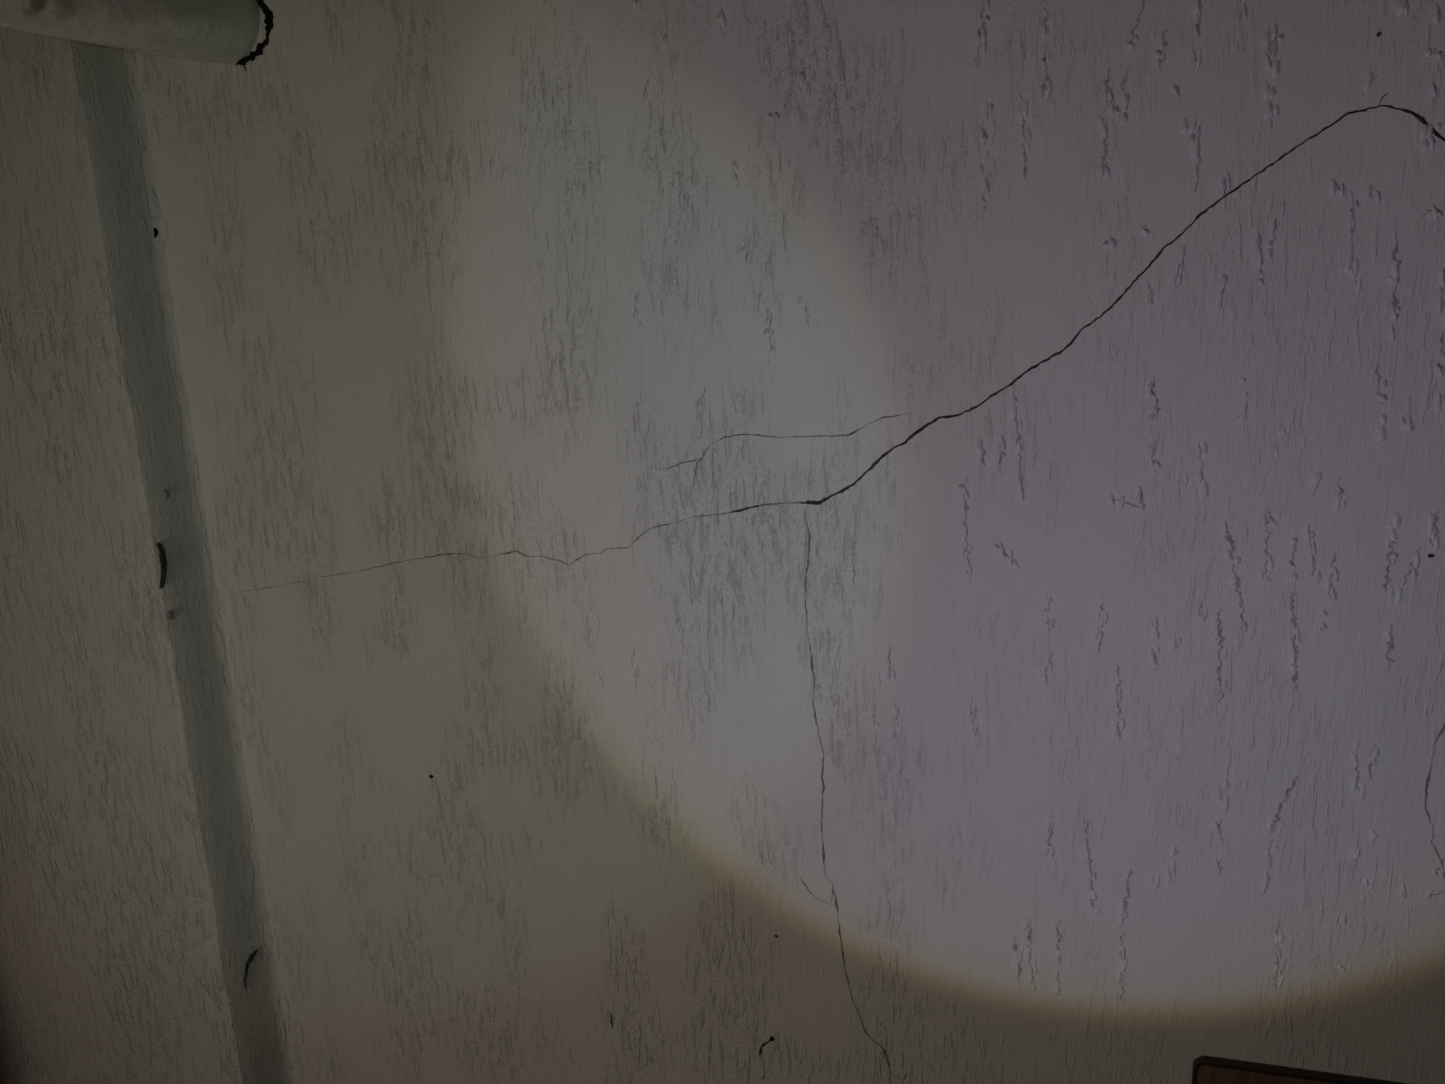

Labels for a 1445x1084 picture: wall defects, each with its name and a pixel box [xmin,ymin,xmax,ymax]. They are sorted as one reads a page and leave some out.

crack [243,93,1445,1084]